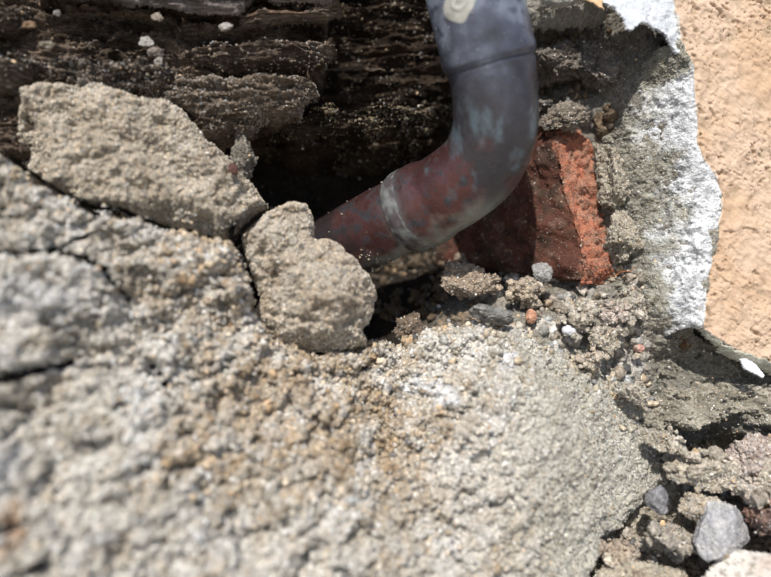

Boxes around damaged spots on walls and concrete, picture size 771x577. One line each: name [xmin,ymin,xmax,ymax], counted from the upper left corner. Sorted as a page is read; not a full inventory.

crack [0,152,265,305]
crack [0,355,86,383]